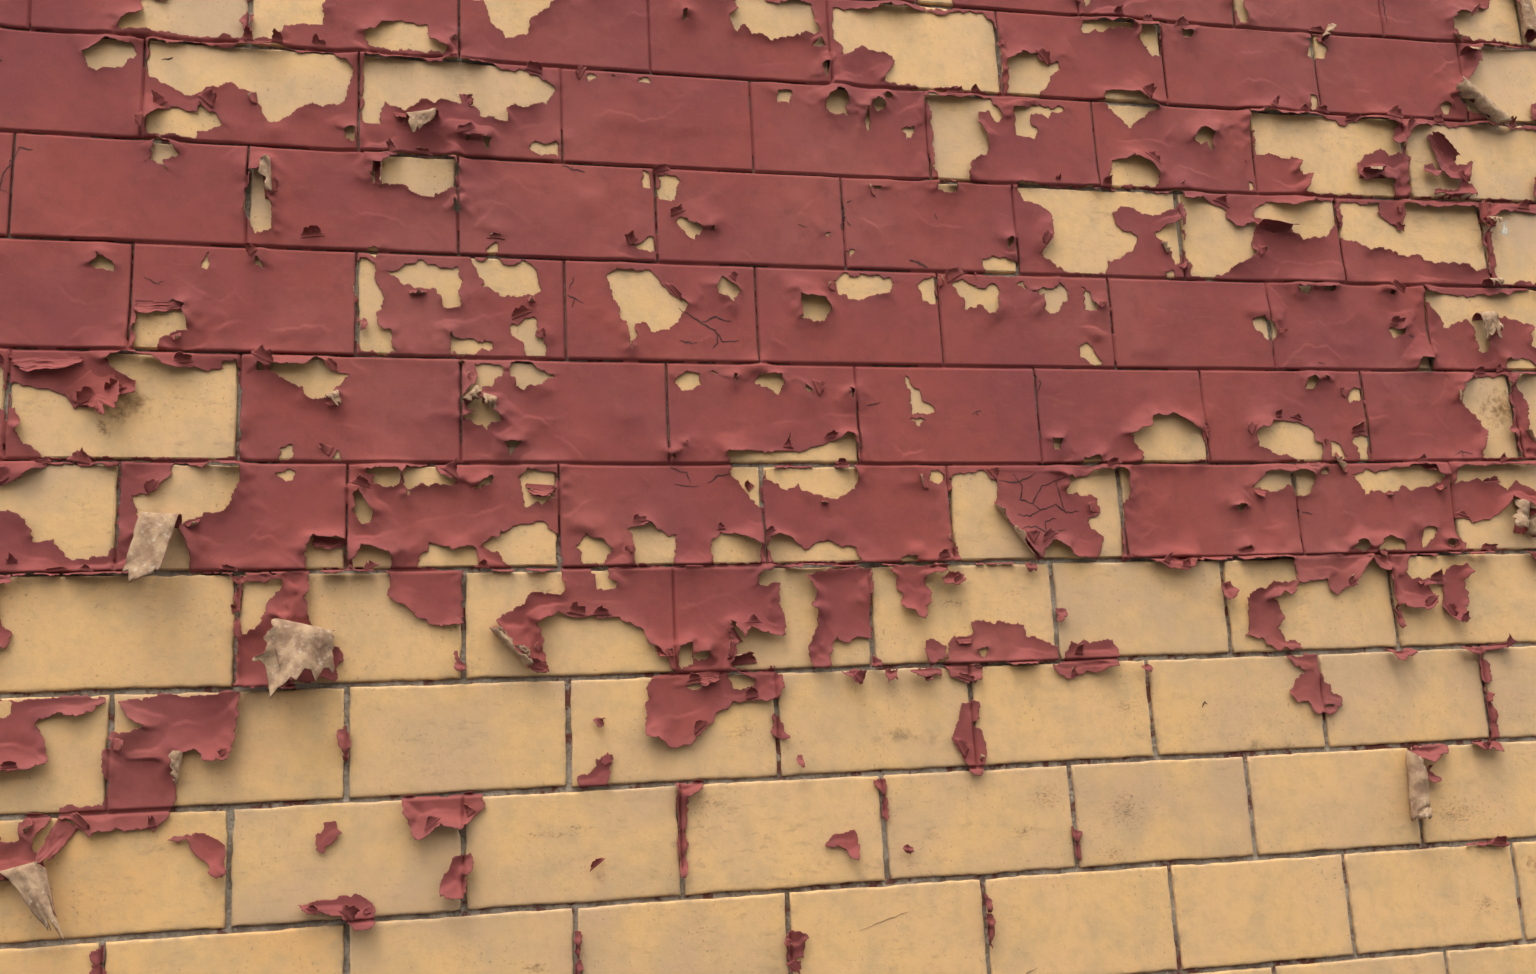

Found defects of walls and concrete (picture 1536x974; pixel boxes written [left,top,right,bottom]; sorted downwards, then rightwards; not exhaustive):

peeling [84,0,558,197]
peeling [730,0,1063,192]
peeling [0,300,348,584]
peeling [243,154,279,267]
peeling [356,232,553,429]
peeling [607,230,688,341]
peeling [642,163,714,239]
peeling [727,429,857,506]
peeling [801,250,893,321]
crack [999,474,1076,532]
peeling [918,0,1536,715]
peeling [0,457,1121,949]